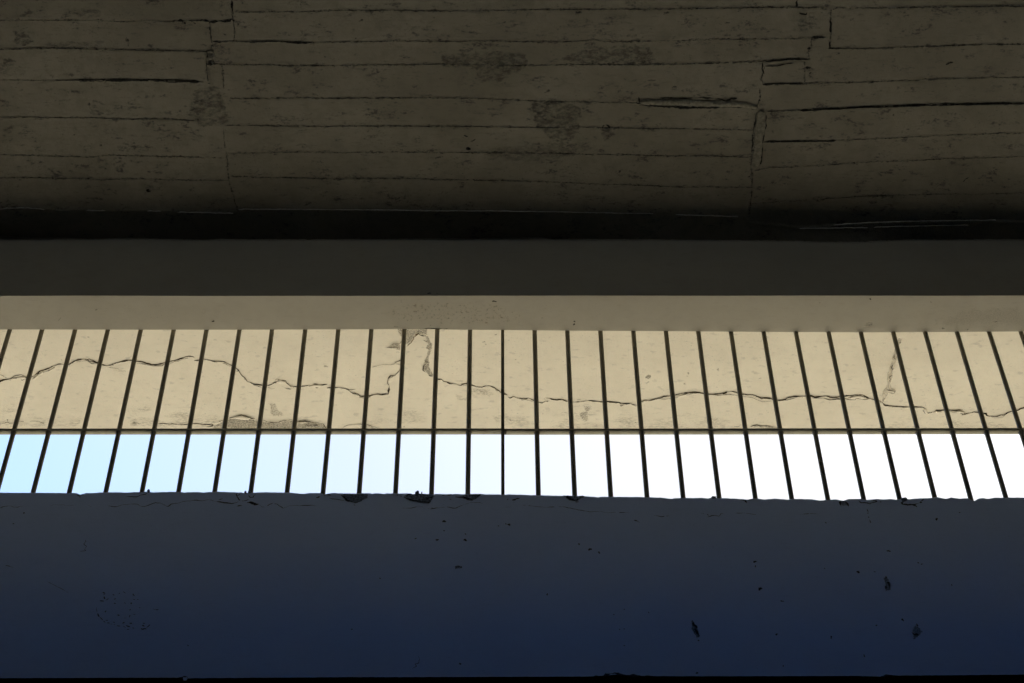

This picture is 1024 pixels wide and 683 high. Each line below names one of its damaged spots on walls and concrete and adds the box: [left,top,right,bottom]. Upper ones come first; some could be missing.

peeling [399,329,432,376]
crack [0,356,400,398]
crack [438,379,1024,418]